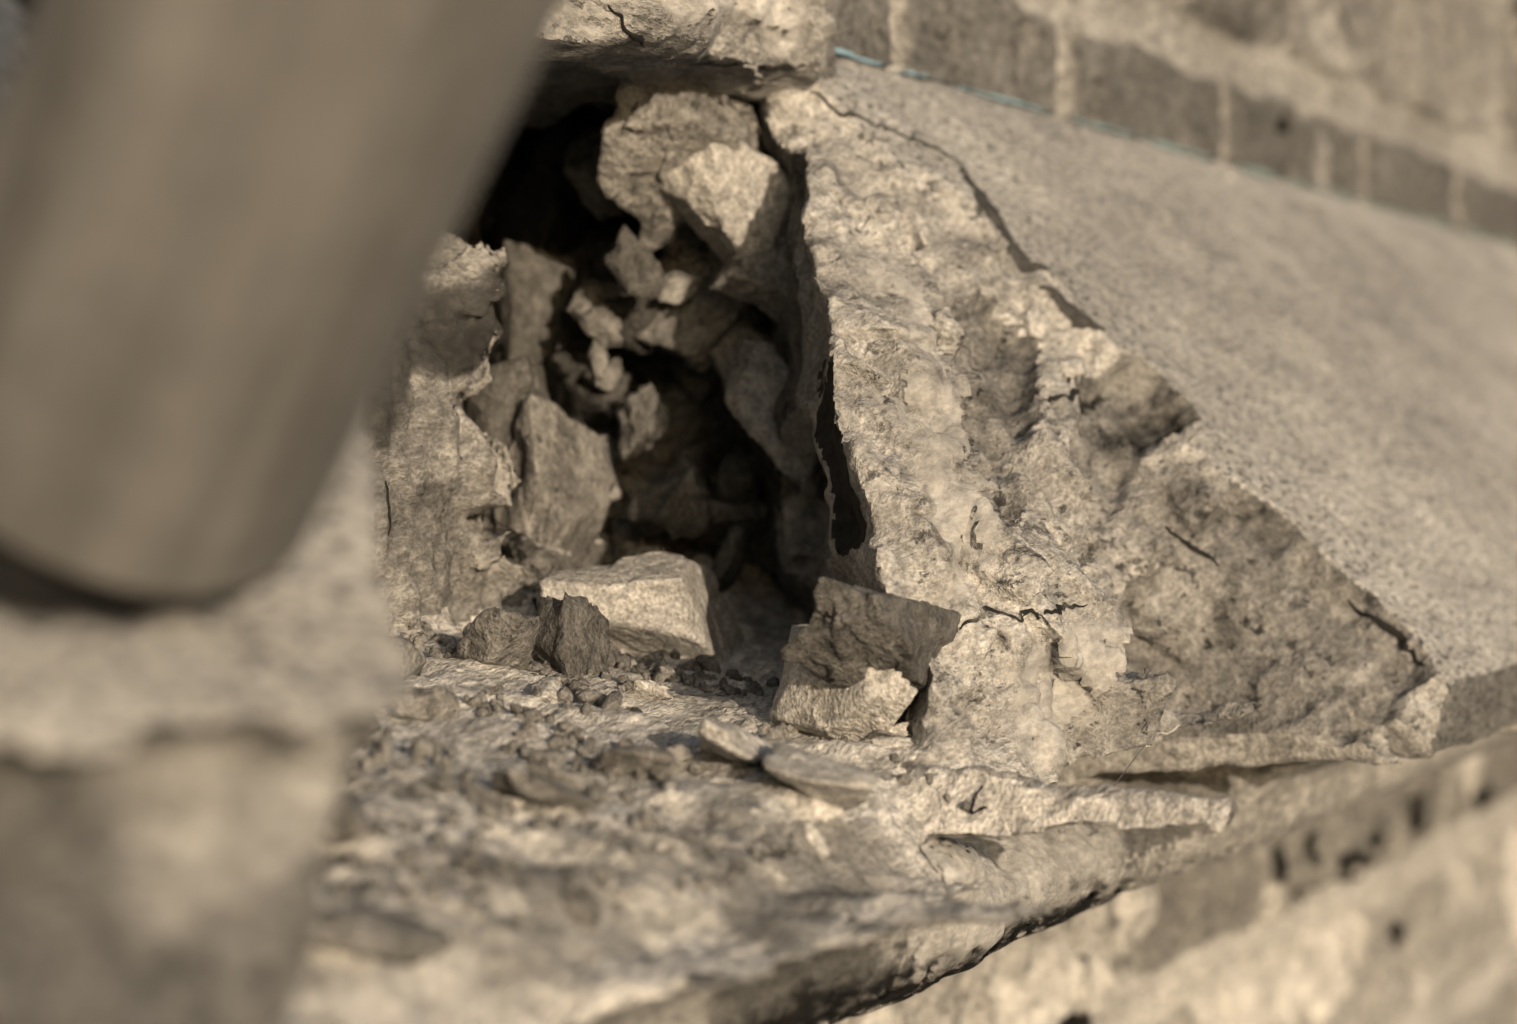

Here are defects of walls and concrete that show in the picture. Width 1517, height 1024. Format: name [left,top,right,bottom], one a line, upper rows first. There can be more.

crack [608,5,645,48]
spalling [429,101,610,293]
crack [683,61,1106,331]
spalling [727,83,1449,809]
spalling [0,330,1232,1024]